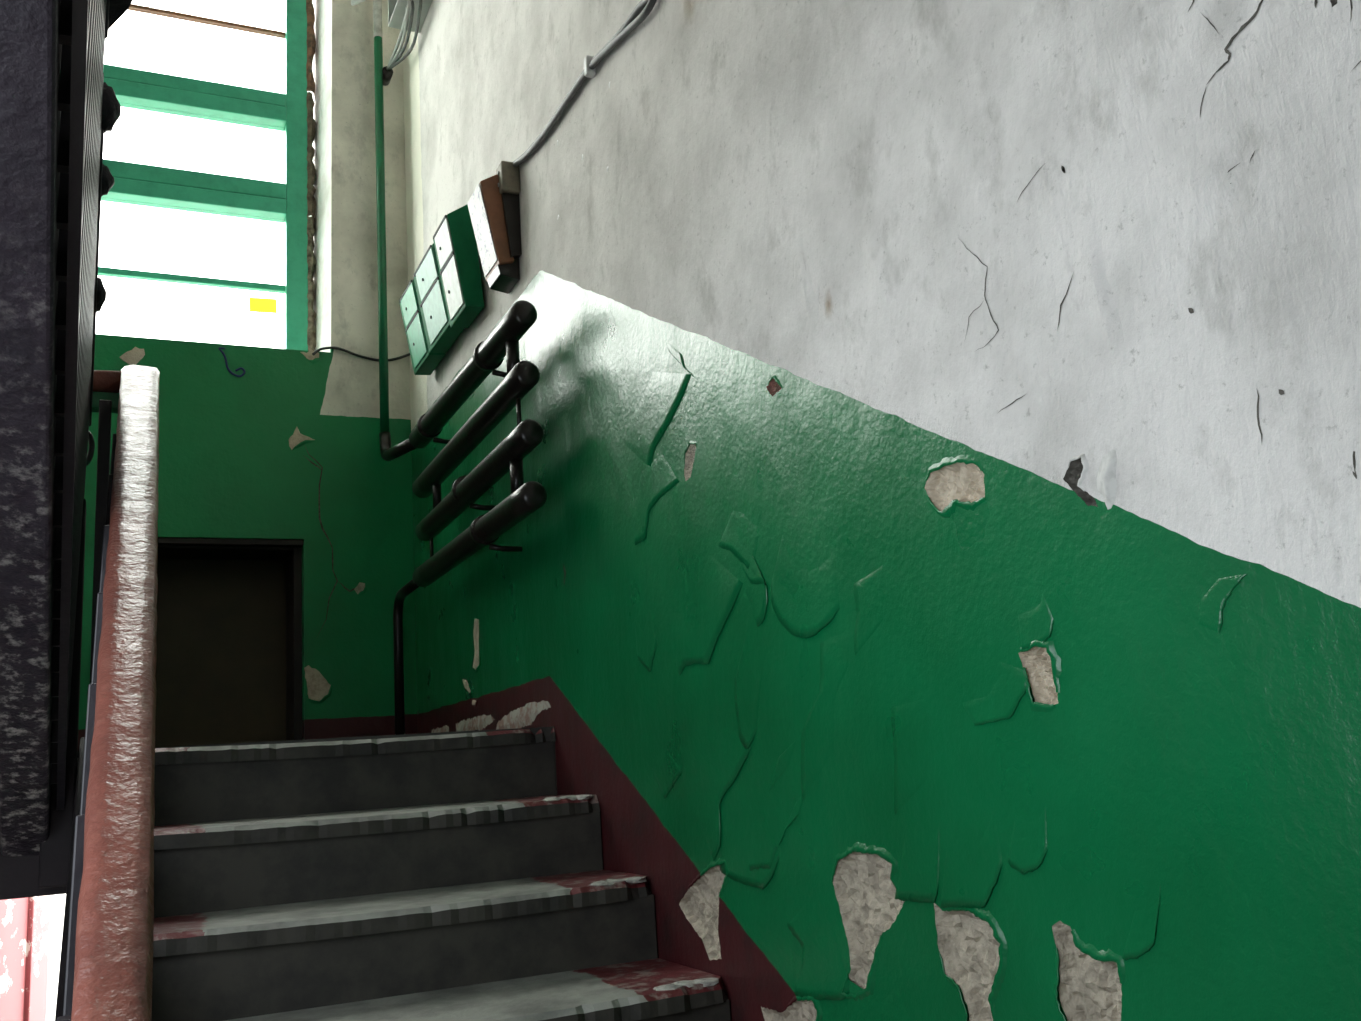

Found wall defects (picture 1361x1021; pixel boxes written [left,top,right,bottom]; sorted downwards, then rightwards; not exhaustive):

peeling [119,347,146,365]
peeling [289,427,317,451]
peeling [623,341,697,545]
spalling [925,455,986,518]
peeling [304,665,333,704]
peeling [431,618,551,733]
spalling [679,858,729,960]
spalling [831,842,905,1001]
spalling [653,977,719,991]
spalling [761,995,823,1021]
spalling [934,903,1008,1021]